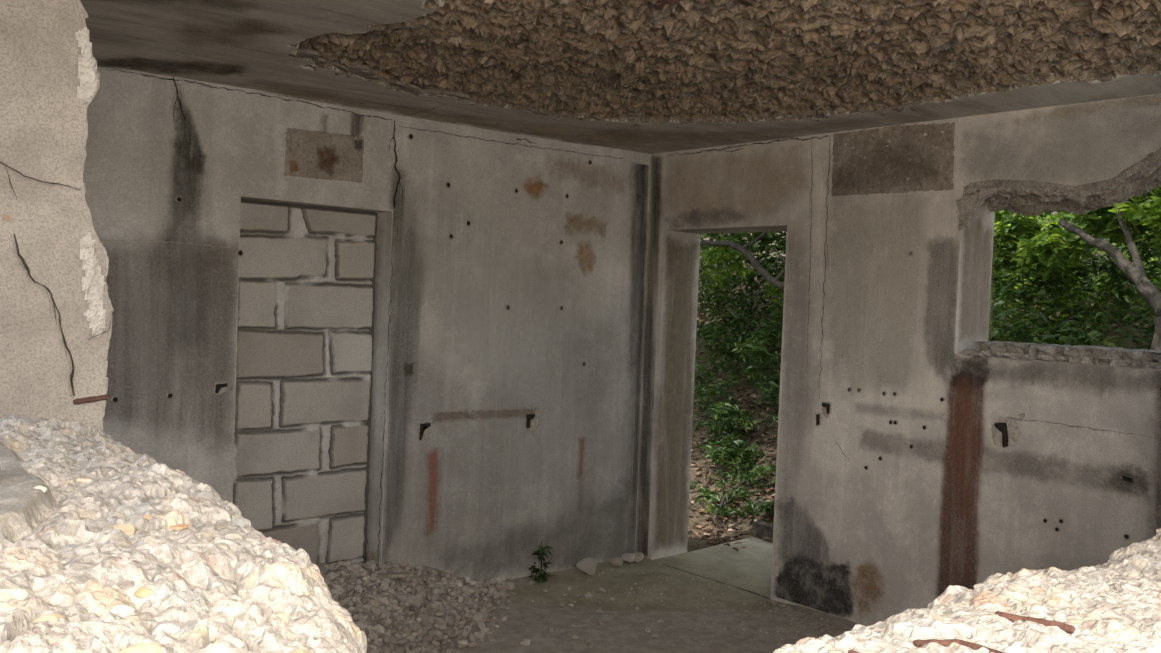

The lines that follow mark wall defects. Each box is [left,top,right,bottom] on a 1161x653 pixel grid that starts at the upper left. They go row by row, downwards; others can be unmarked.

spalling [75,27,99,104]
spalling [289,0,1161,127]
crack [0,161,80,198]
damp [176,99,204,188]
damp [351,114,362,149]
spalling [955,148,1161,231]
crack [14,233,112,396]
spalling [80,230,106,337]
damp [106,257,133,418]
corrosion [938,370,986,597]